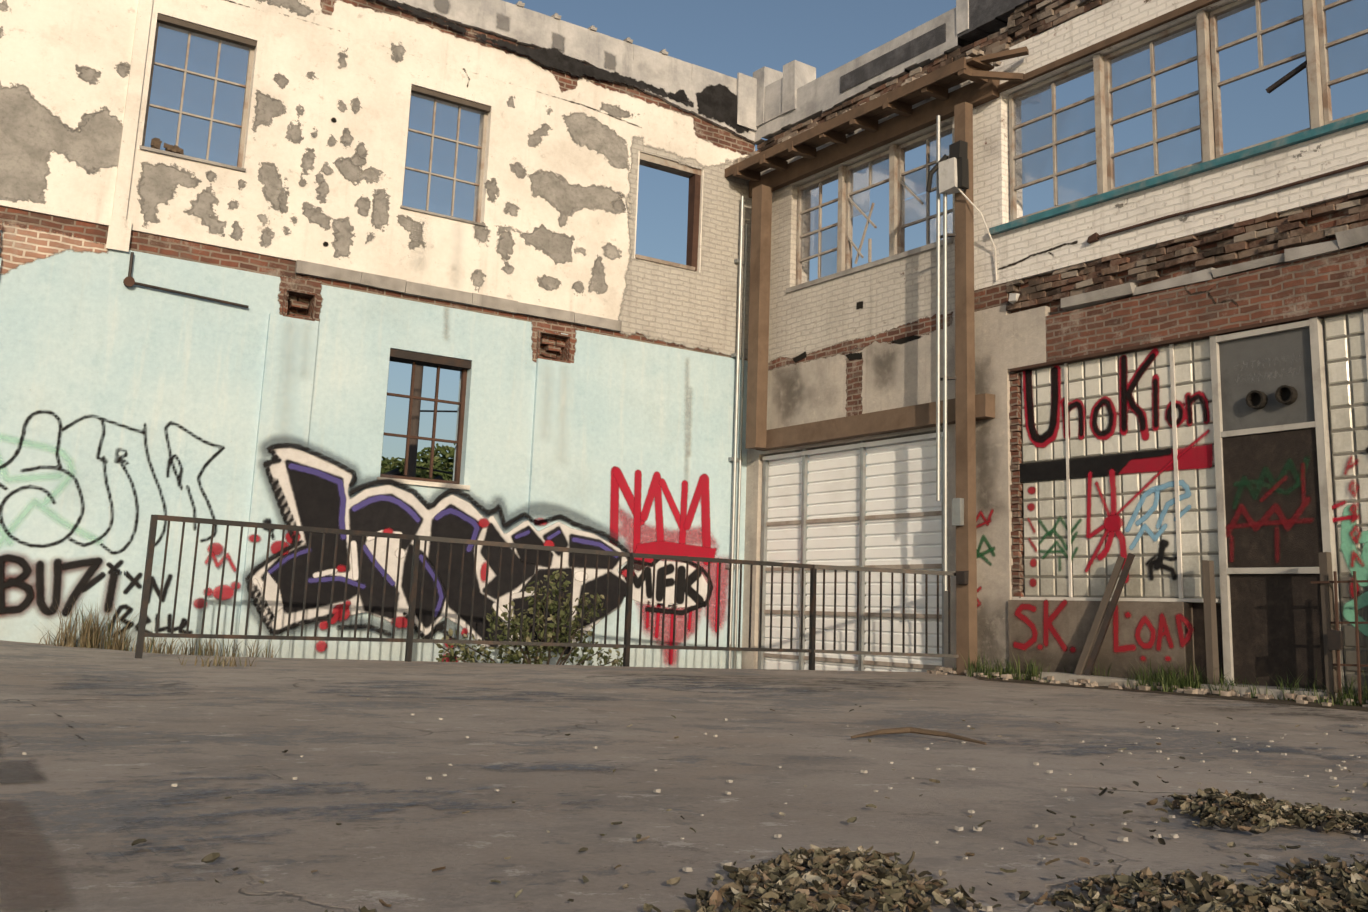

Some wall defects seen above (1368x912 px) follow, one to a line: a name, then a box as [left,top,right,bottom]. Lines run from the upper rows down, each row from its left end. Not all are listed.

peeling [75,62,130,85]
peeling [0,82,123,204]
peeling [137,73,425,260]
peeling [256,0,755,363]
flaking render [0,223,108,275]
spalling [1006,189,1368,312]
spalling [768,311,953,417]